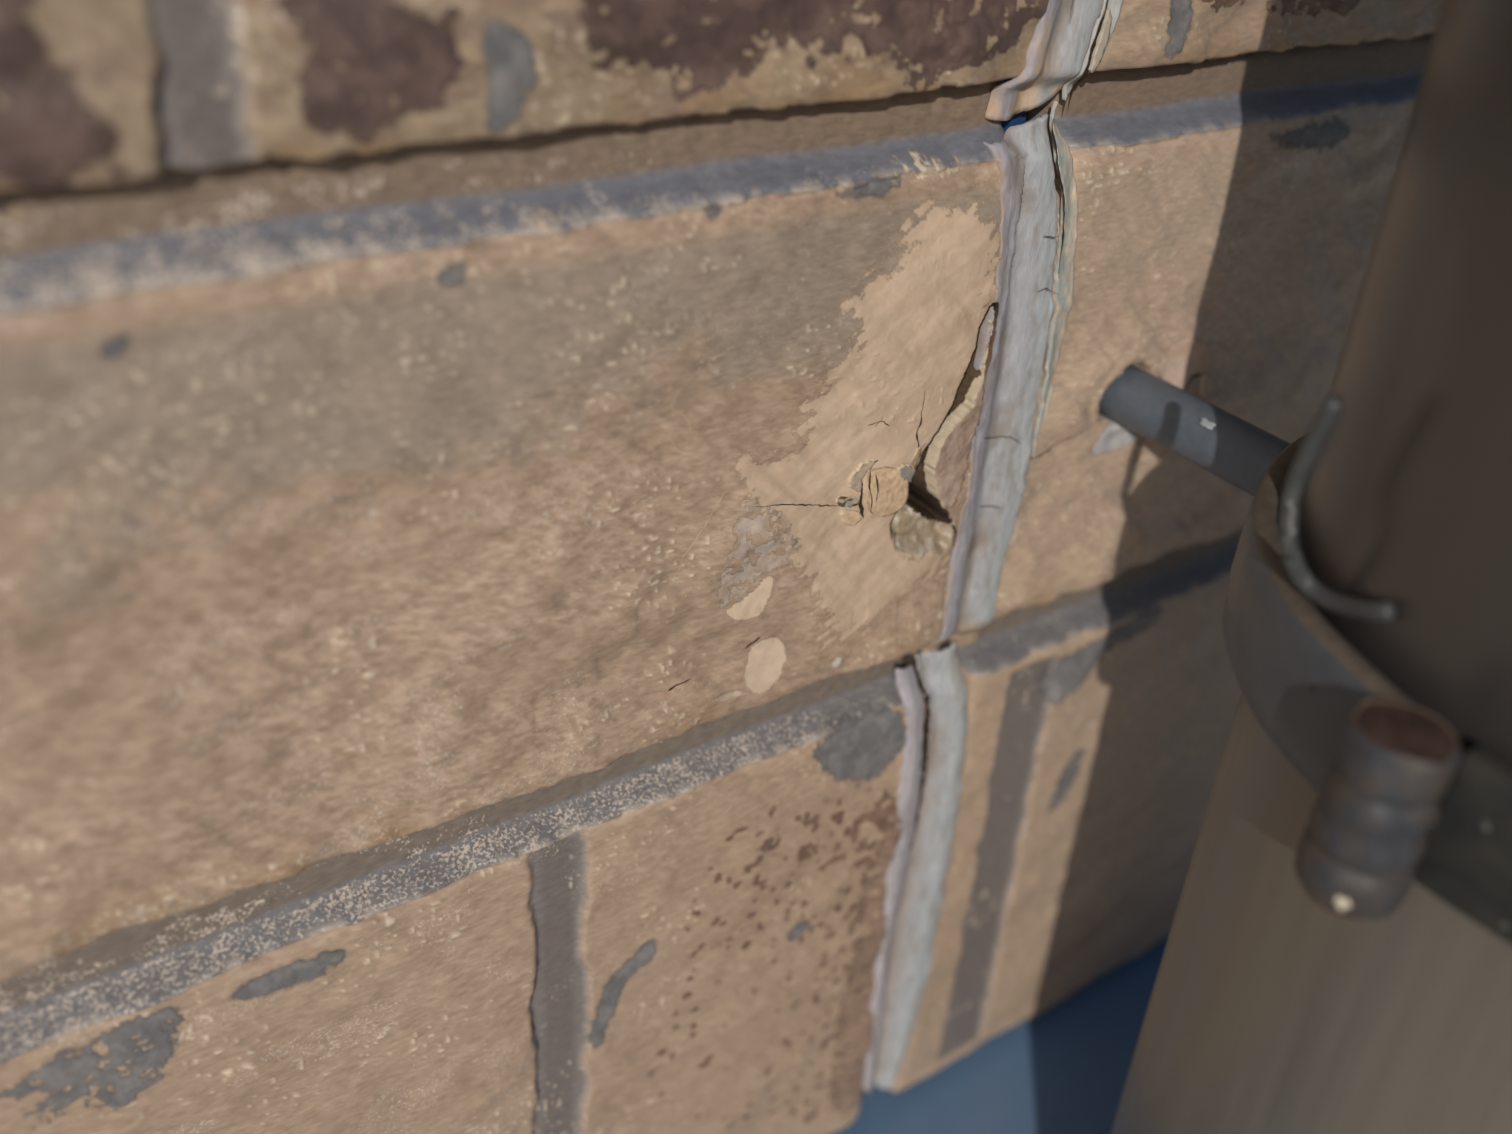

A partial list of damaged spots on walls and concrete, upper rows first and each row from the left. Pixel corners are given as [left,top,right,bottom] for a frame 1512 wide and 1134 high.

peeling [0,0,127,190]
peeling [276,0,465,144]
peeling [482,20,537,133]
peeling [578,0,1049,101]
peeling [1165,0,1245,58]
peeling [1267,0,1360,17]
peeling [716,199,1001,668]
crack [753,302,1098,551]